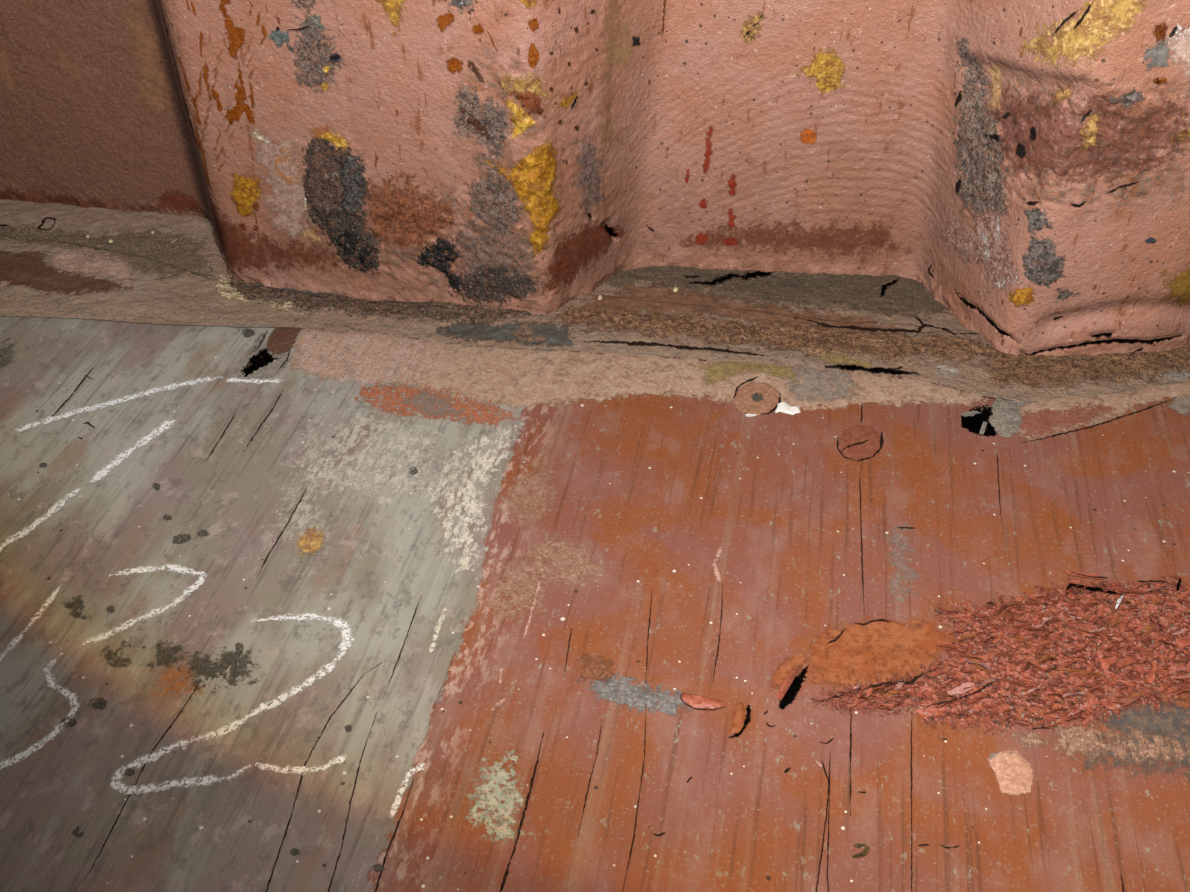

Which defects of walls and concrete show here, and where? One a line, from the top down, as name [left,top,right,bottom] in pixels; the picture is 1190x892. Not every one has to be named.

corrosion [177,0,267,253]
crack [685,271,772,285]
corrosion [355,379,525,426]
peeling [289,328,989,416]
crack [583,341,764,356]
peeling [267,402,526,580]
mould [172,530,209,544]
mould [64,596,87,619]
mould [148,641,258,693]
peeling [577,653,691,716]
peeling [770,571,1190,741]
leakage [1012,701,1190,783]